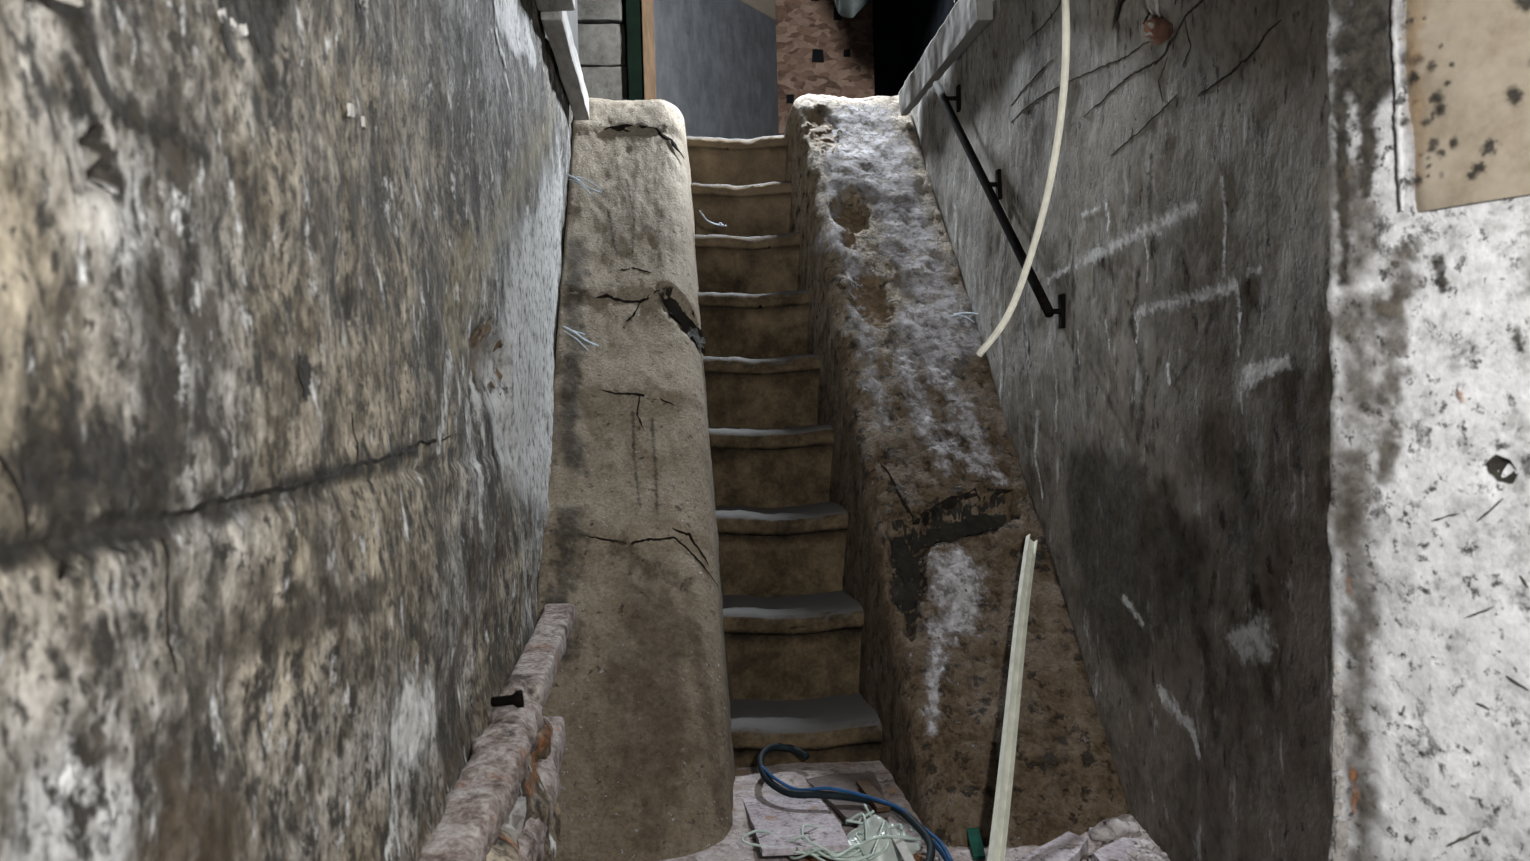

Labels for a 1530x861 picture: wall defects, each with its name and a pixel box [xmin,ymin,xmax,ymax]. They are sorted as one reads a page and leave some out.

crack [604,124,684,158]
spalling [1112,0,1126,29]
crack [1011,0,1281,155]
spalling [1143,0,1177,65]
water stain [1468,139,1496,179]
crack [595,267,660,322]
water stain [818,105,1007,485]
water stain [1046,153,1291,434]
water stain [1315,0,1458,861]
crack [160,481,308,674]
crack [585,528,718,586]
water stain [923,549,984,733]